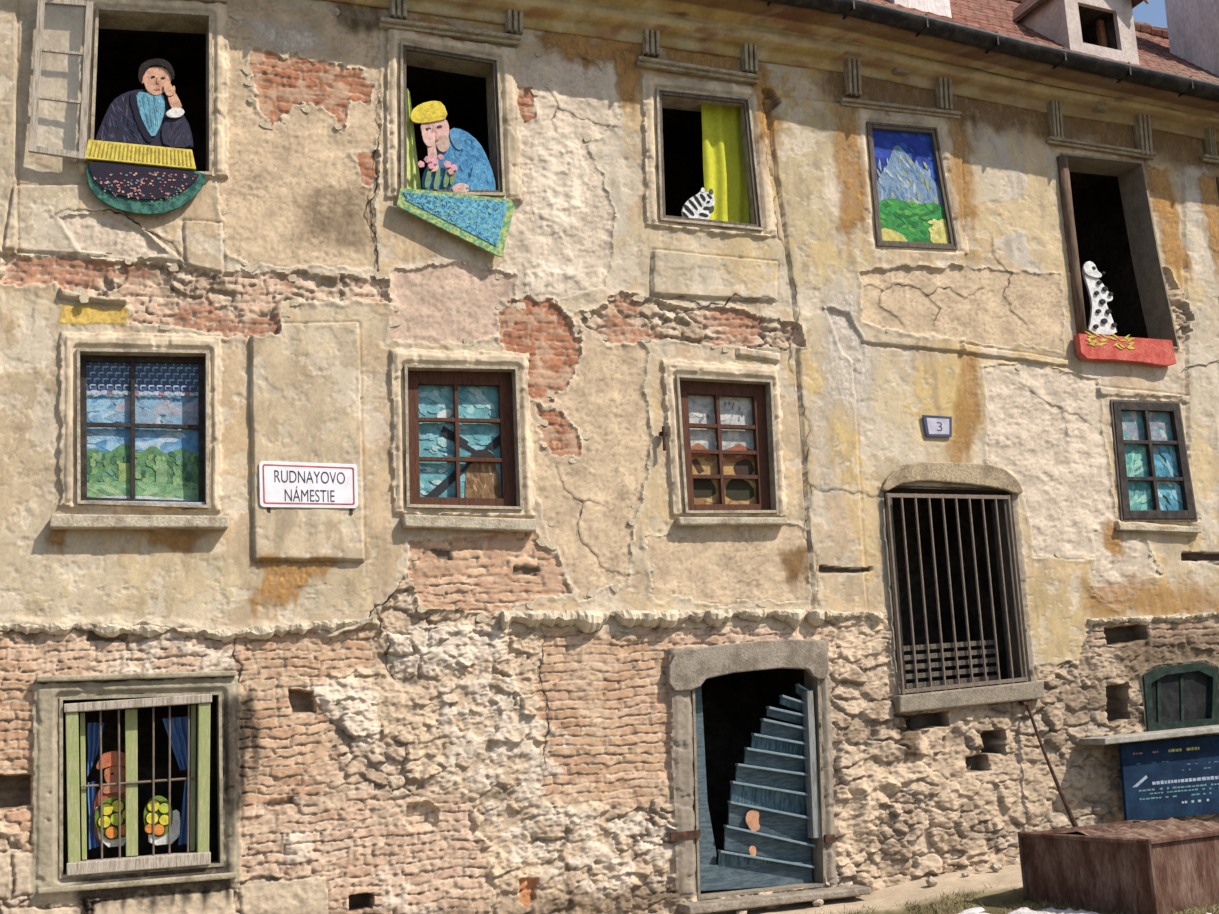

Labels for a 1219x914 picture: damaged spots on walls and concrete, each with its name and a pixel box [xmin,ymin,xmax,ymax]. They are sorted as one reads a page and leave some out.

damp [823,71,936,108]
damp [952,95,1140,161]
damp [1151,129,1219,170]
crack [364,98,382,303]
flaking render [0,3,874,622]
crack [864,240,1028,326]
flaking render [823,263,1165,610]
crack [556,463,637,576]
spalling [0,773,33,811]
crack [539,635,550,786]
spalling [965,729,1007,773]
spalling [349,892,375,913]